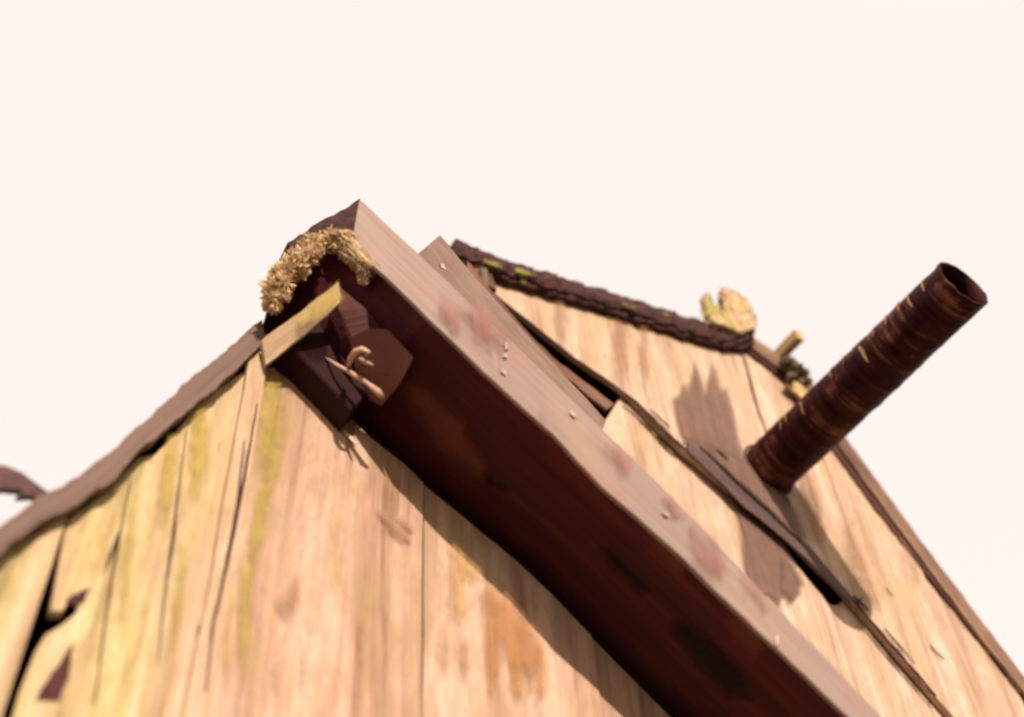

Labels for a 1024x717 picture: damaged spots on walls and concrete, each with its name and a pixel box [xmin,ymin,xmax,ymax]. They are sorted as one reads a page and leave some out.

crack [204,404,258,691]